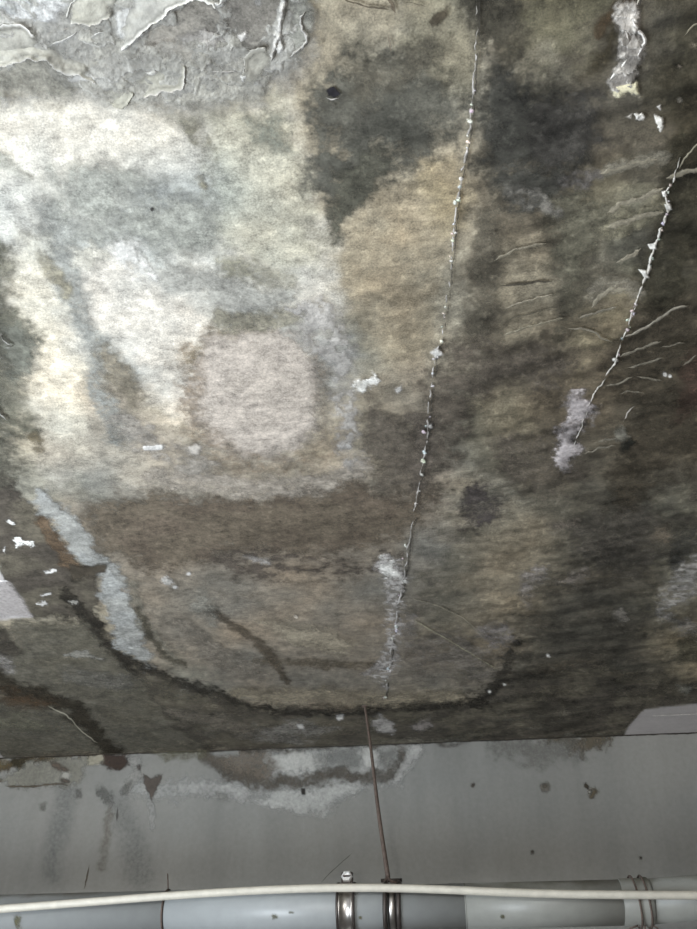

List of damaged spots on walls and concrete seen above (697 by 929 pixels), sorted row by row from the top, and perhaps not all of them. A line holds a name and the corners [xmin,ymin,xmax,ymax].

peeling [0,0,300,112]
leakage [299,39,463,245]
peeling [429,6,447,27]
leakage [458,0,523,50]
leakage [587,0,647,97]
leakage [0,243,43,453]
leakage [22,164,297,462]
leakage [180,296,351,472]
crack [383,1,480,700]
leakage [464,38,697,583]
crack [574,144,697,444]
leakage [0,342,697,819]